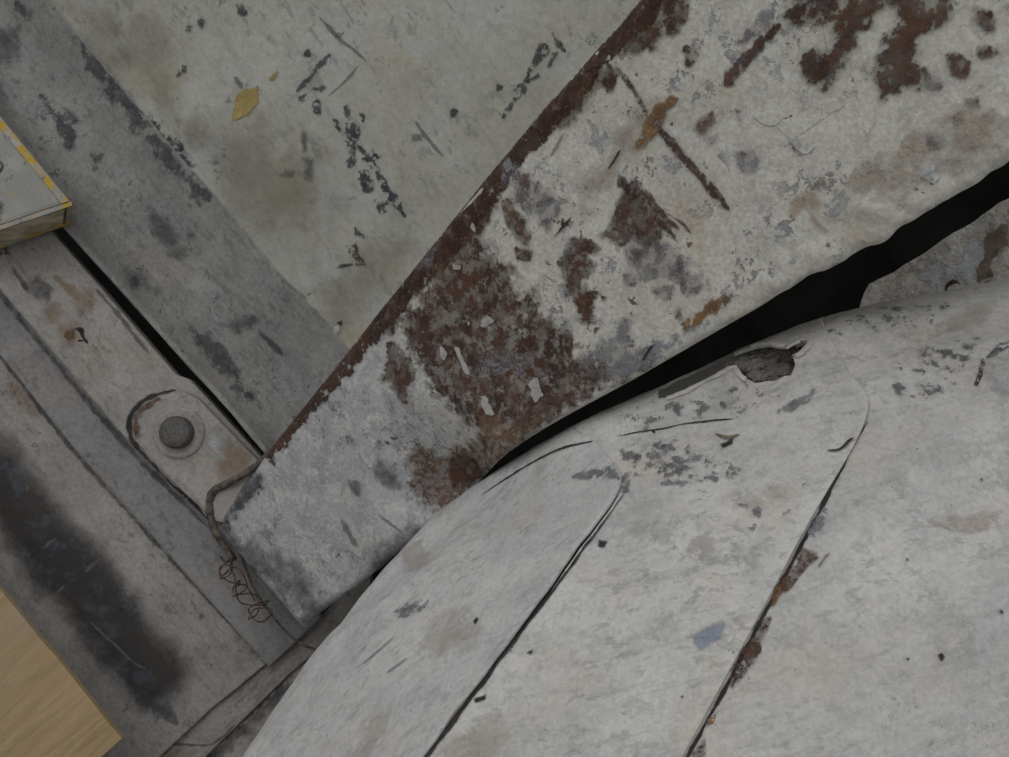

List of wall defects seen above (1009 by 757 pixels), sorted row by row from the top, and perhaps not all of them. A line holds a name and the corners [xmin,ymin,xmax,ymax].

corrosion [724,0,953,100]
corrosion [946,45,998,78]
corrosion [977,10,995,32]
corrosion [373,167,606,509]
peeling [620,439,741,492]
corrosion [731,548,818,687]